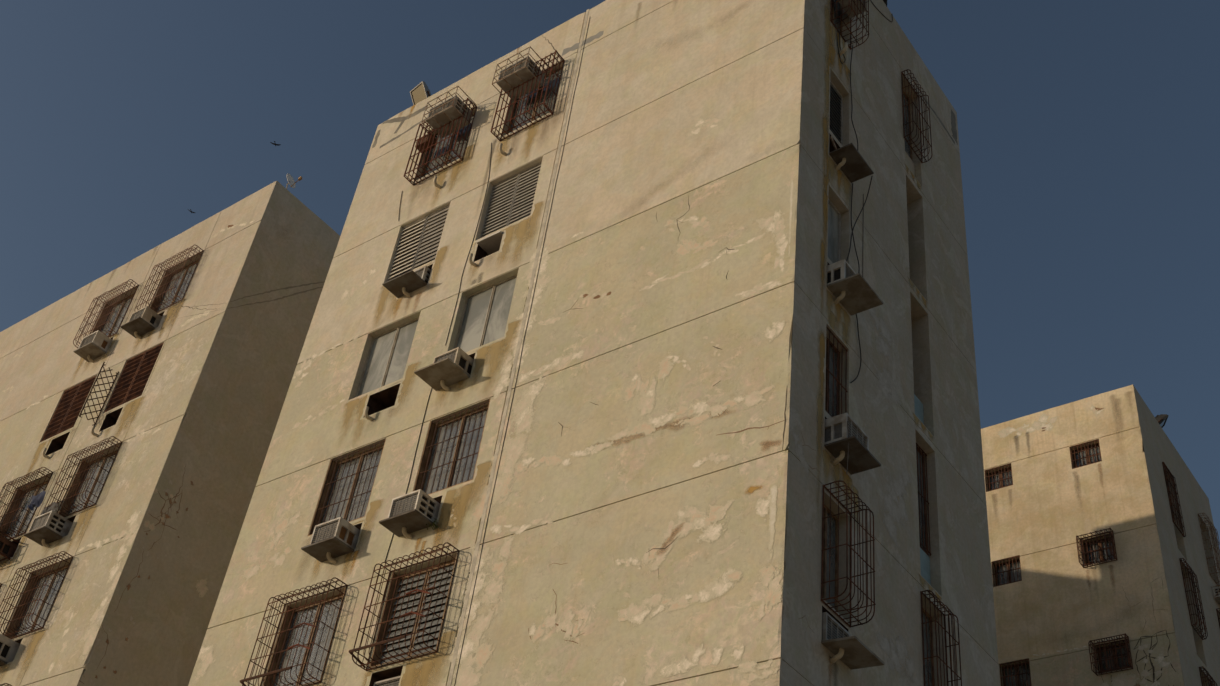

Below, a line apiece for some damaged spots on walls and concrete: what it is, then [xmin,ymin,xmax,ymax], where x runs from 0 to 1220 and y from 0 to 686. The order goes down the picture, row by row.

corrosion [821,0,850,282]
crack [79,463,187,684]
peeling [444,238,786,686]